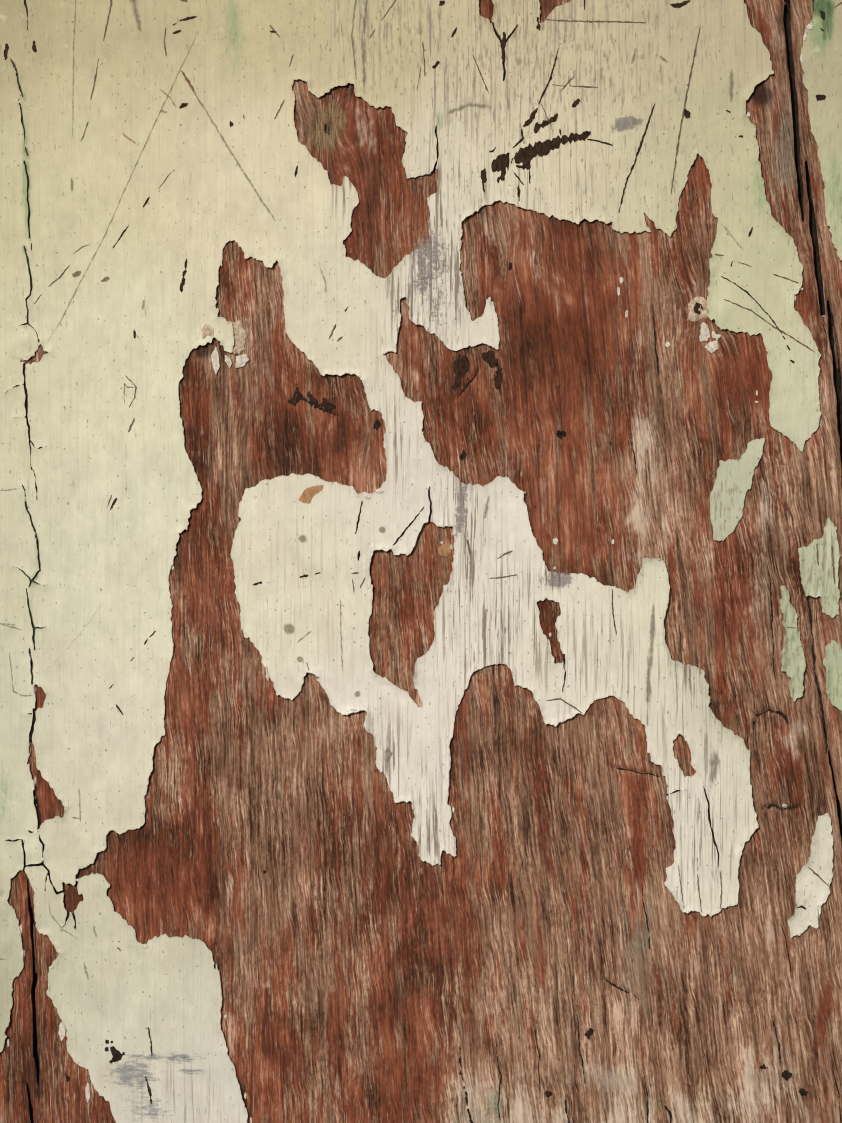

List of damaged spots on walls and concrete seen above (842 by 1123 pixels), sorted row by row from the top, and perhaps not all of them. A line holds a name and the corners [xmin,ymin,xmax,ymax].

peeling [292,79,438,278]
peeling [744,0,842,485]
crack [781,0,842,478]
crack [10,59,45,743]
peeling [31,681,46,715]
peeling [27,735,65,832]
peeling [76,154,842,1123]
crack [767,567,776,679]
crack [806,597,842,843]
crack [7,790,79,1123]
peeling [0,857,116,1123]
crack [773,1021,781,1063]